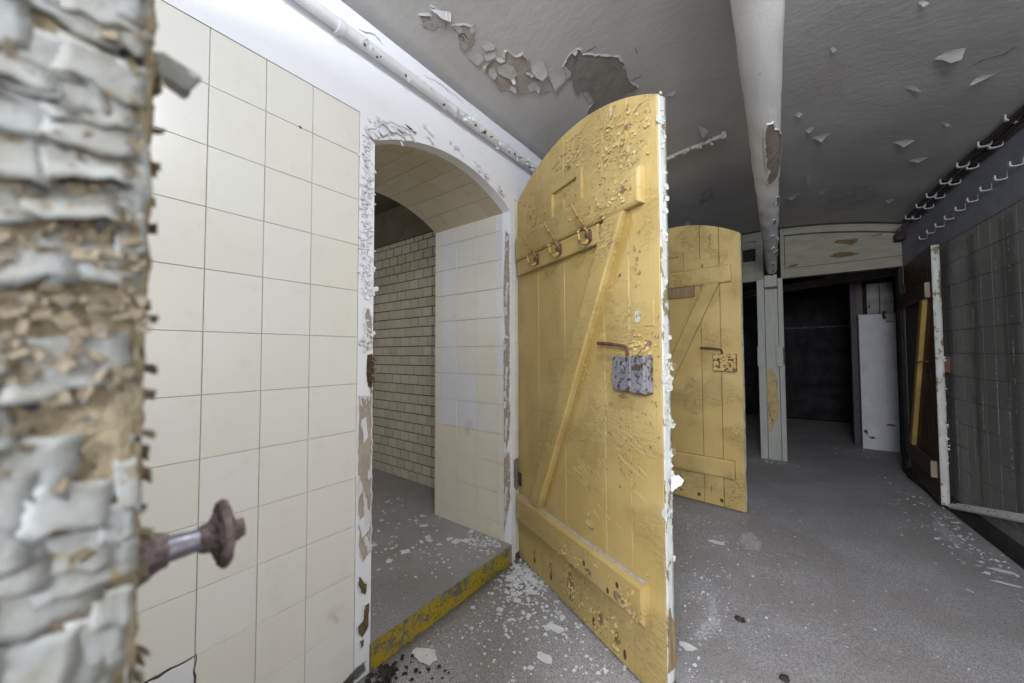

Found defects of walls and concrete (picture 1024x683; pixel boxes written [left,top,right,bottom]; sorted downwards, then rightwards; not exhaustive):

peeling [935,48,966,63]
peeling [150,161,163,179]
peeling [763,121,801,268]
peeling [148,223,158,235]
peeling [146,300,159,324]
peeling [417,4,713,590]
spalling [355,116,434,563]
peeling [144,363,159,375]
peeling [144,388,158,400]
peeling [141,429,156,483]
spalling [356,576,370,650]
peeling [134,644,151,683]